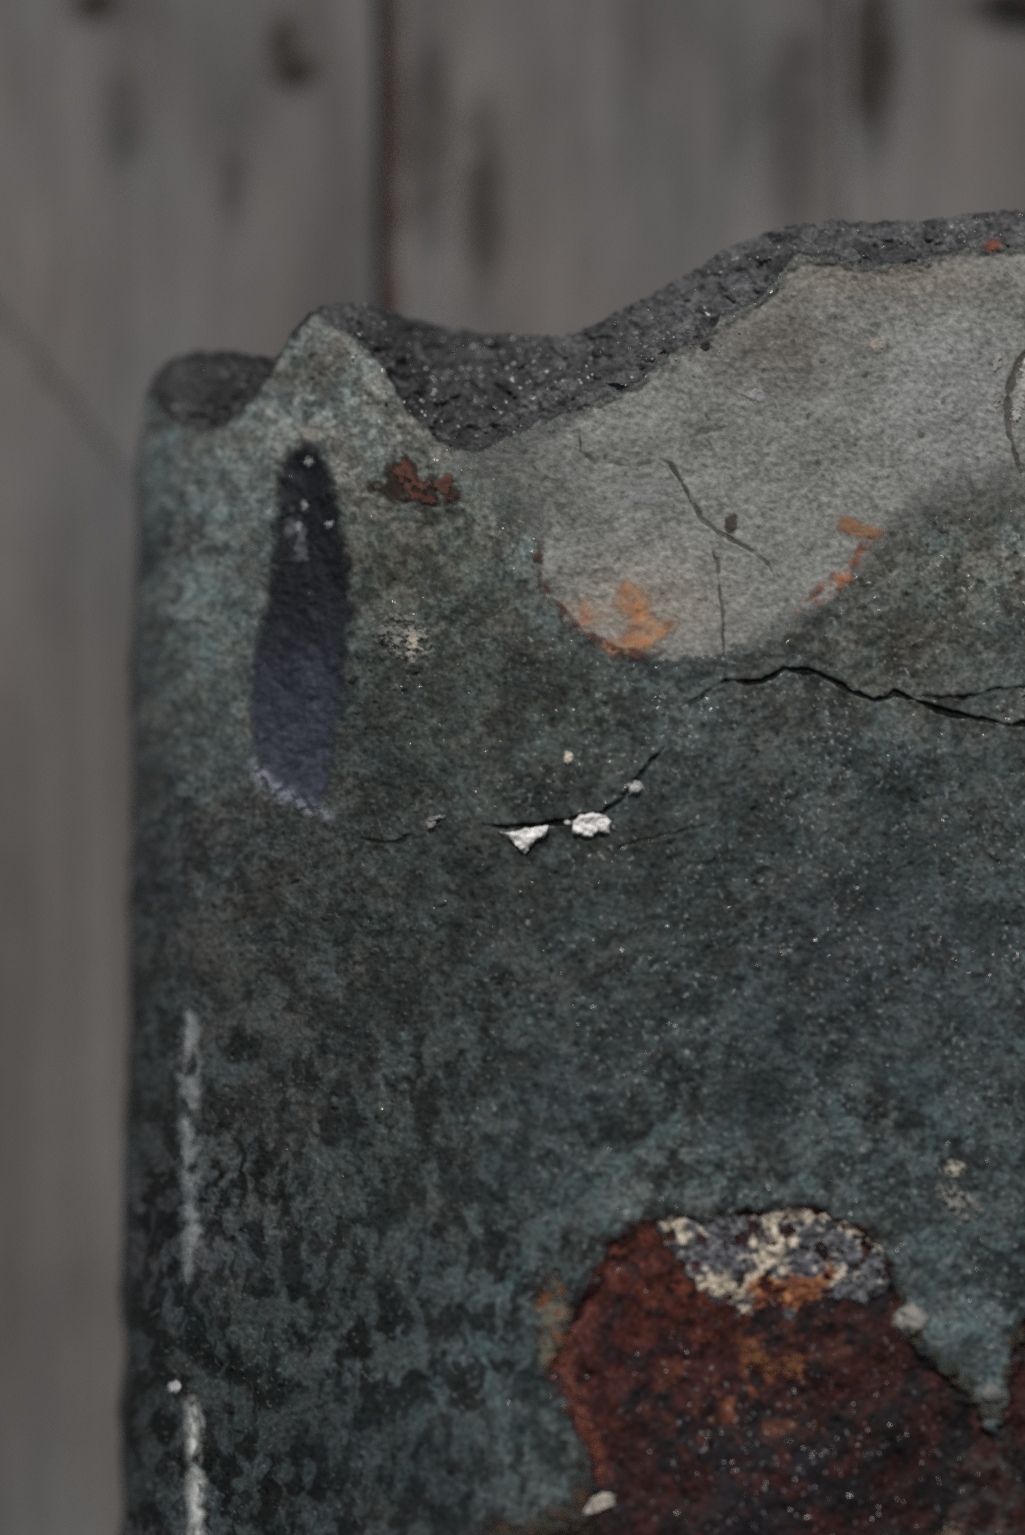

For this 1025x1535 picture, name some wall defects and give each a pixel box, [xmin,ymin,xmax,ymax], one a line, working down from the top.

crack [147,209,1025,468]
rust [367,454,459,504]
spalling [481,250,1025,662]
rust [534,550,669,659]
rust [810,516,878,599]
crack [664,460,1025,726]
crack [366,814,445,844]
crack [490,750,661,854]
rust [536,1203,1025,1535]